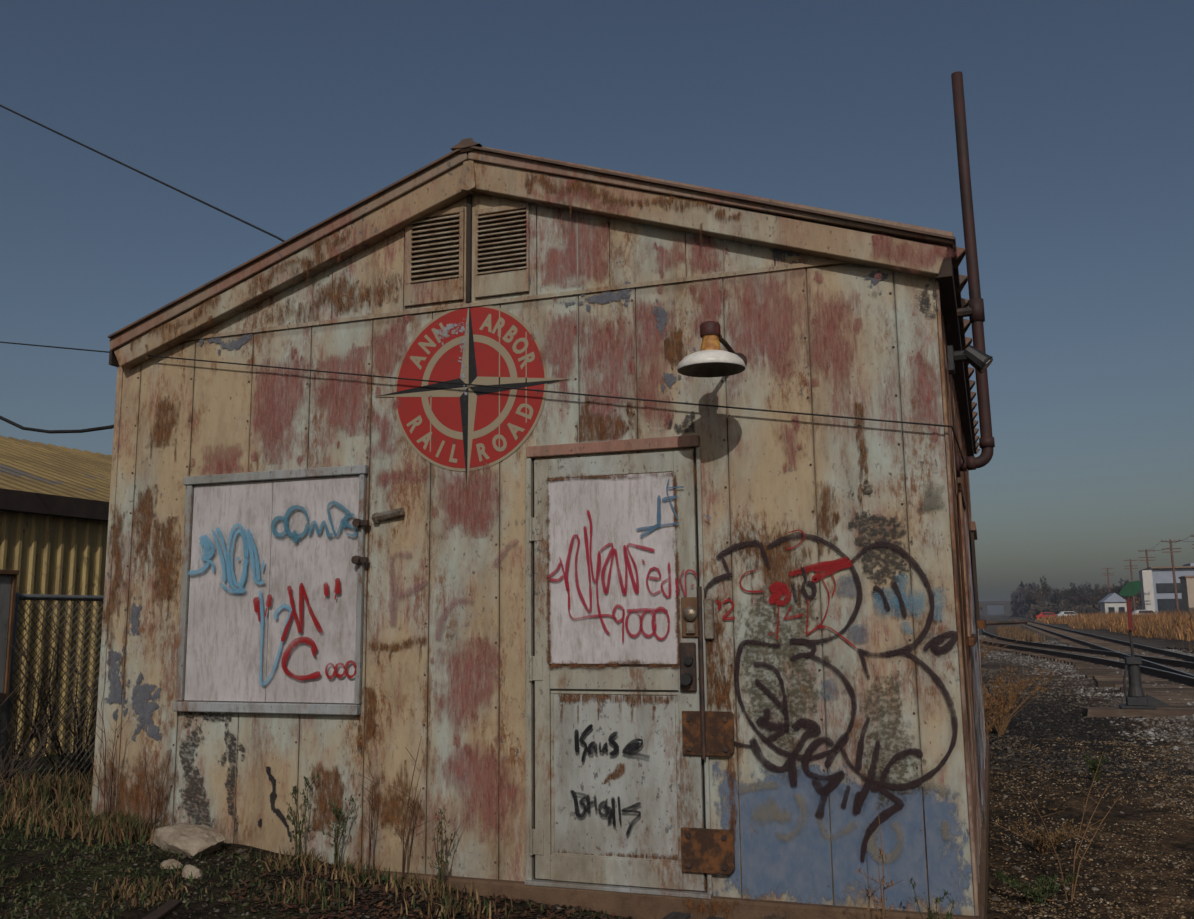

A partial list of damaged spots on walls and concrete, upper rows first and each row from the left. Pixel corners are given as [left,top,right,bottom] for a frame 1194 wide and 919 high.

rust [147,396,180,461]
rust [104,484,180,677]
peeling [98,597,161,741]